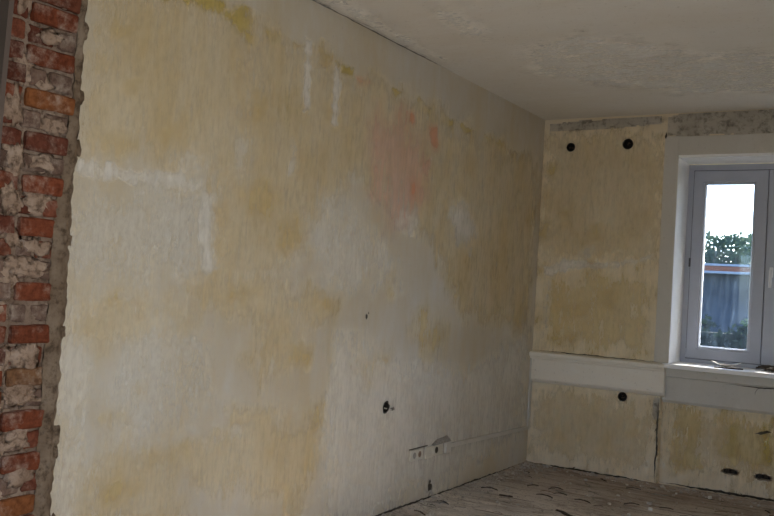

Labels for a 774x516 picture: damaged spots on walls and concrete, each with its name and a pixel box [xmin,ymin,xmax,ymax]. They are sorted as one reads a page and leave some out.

flaking render [0,0,89,516]
peeling [539,109,774,272]